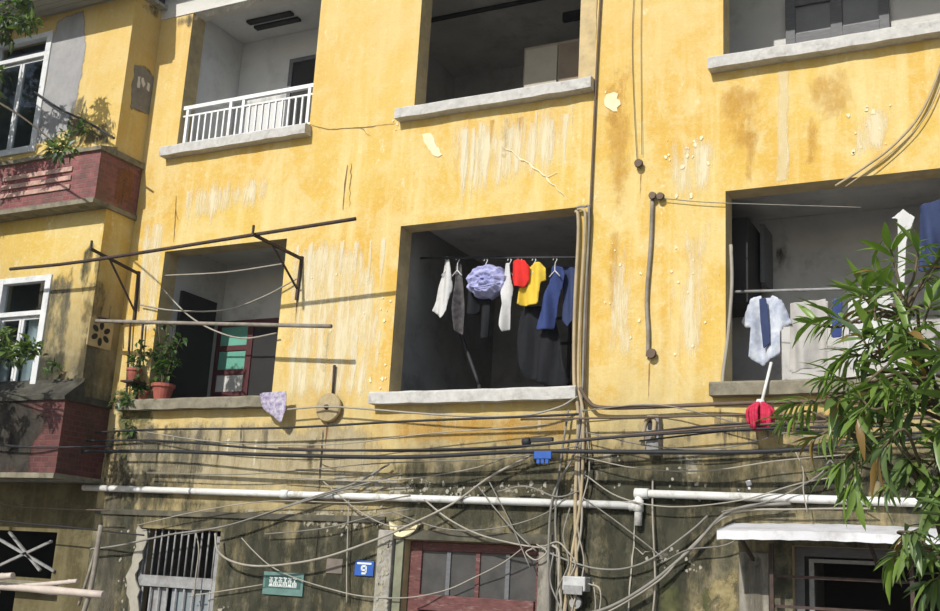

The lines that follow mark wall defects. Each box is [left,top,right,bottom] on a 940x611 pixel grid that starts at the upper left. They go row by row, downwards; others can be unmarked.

spalling [130,65,154,114]
peeling [422,133,442,157]
water stain [461,111,569,190]
water stain [37,273,72,380]
water stain [76,283,110,383]
water stain [398,459,427,516]
water stain [440,413,782,611]
water stain [796,450,904,505]